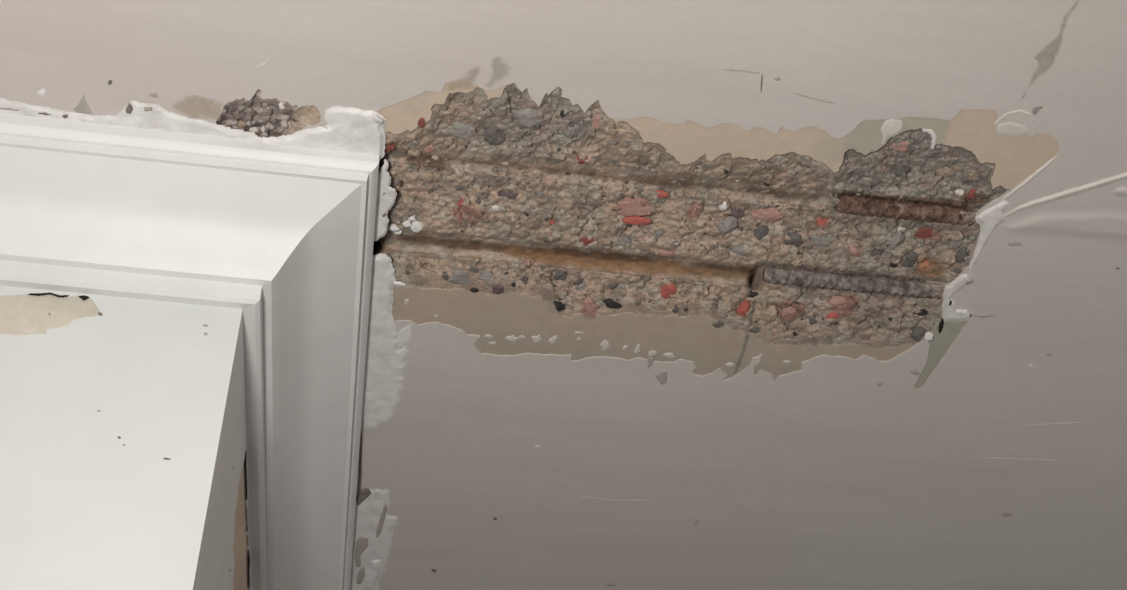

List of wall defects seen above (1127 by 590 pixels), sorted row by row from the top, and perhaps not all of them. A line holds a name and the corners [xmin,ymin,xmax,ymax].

flaking render [216,89,321,138]
rust [841,191,987,207]
rust [401,236,753,278]
spalling [373,81,1059,389]
peeling [0,294,99,335]
peeling [230,463,248,590]